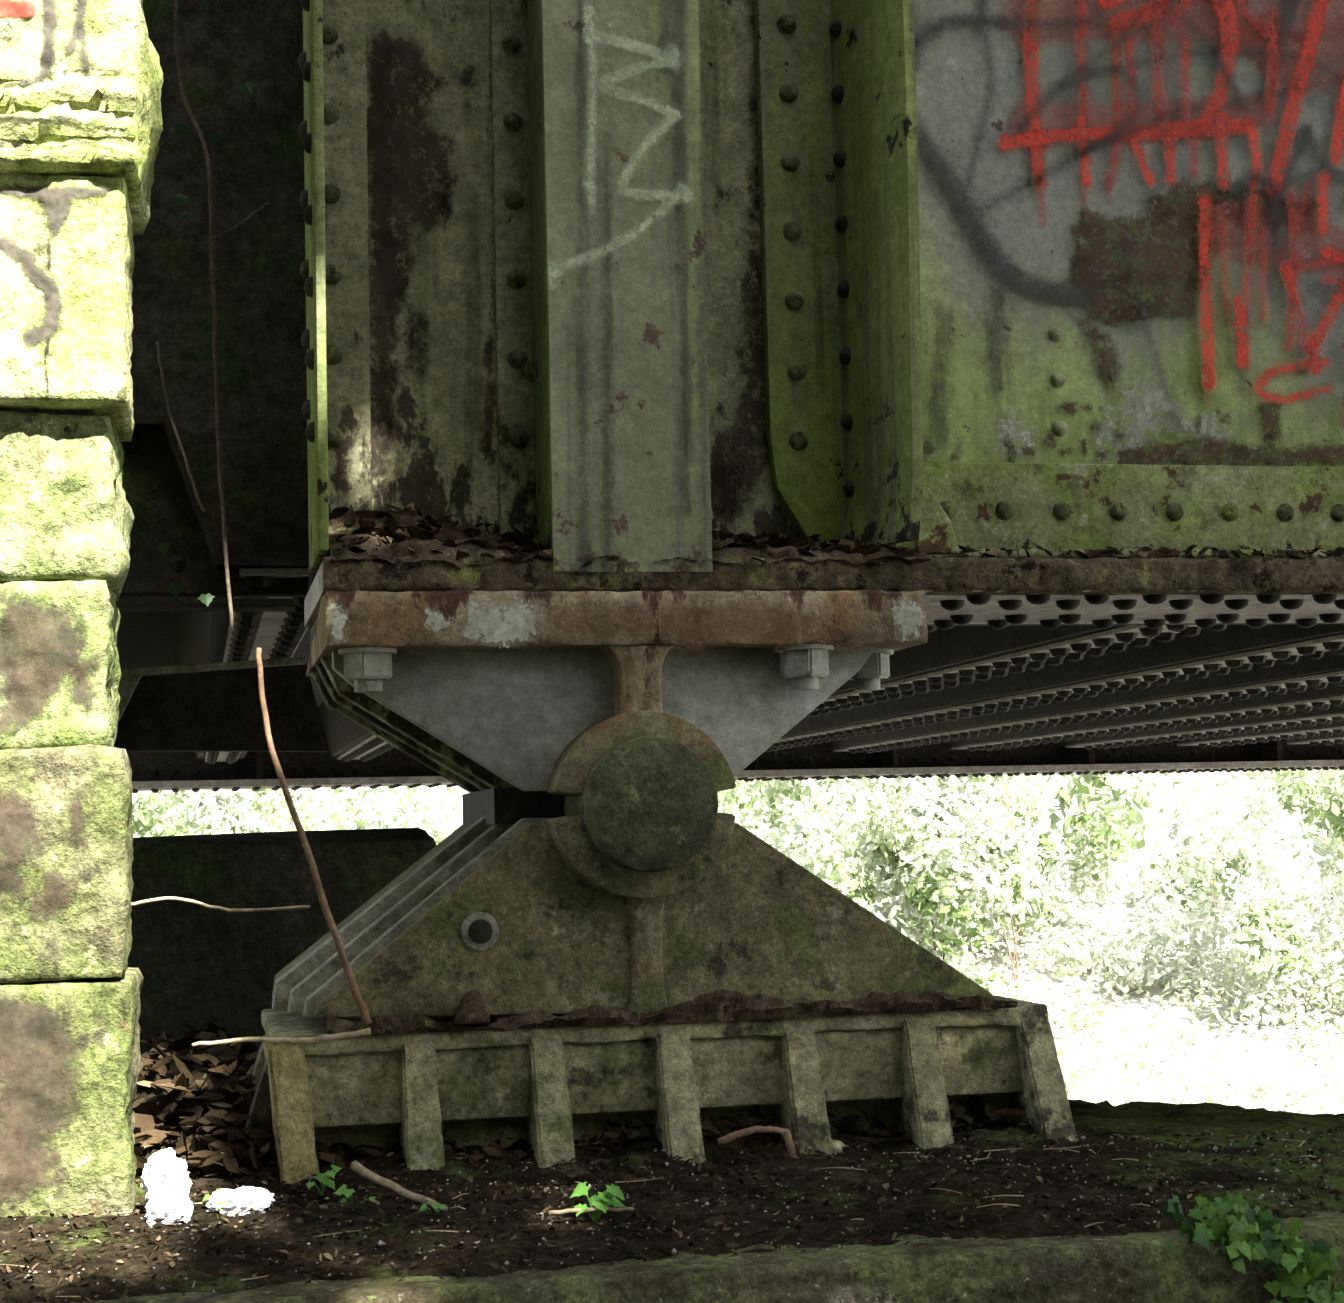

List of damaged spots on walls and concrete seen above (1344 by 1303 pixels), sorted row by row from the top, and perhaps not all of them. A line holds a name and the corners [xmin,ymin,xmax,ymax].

rust [1068,177,1318,392]
peeling [327,603,348,641]
peeling [424,601,542,648]
peeling [891,601,926,641]